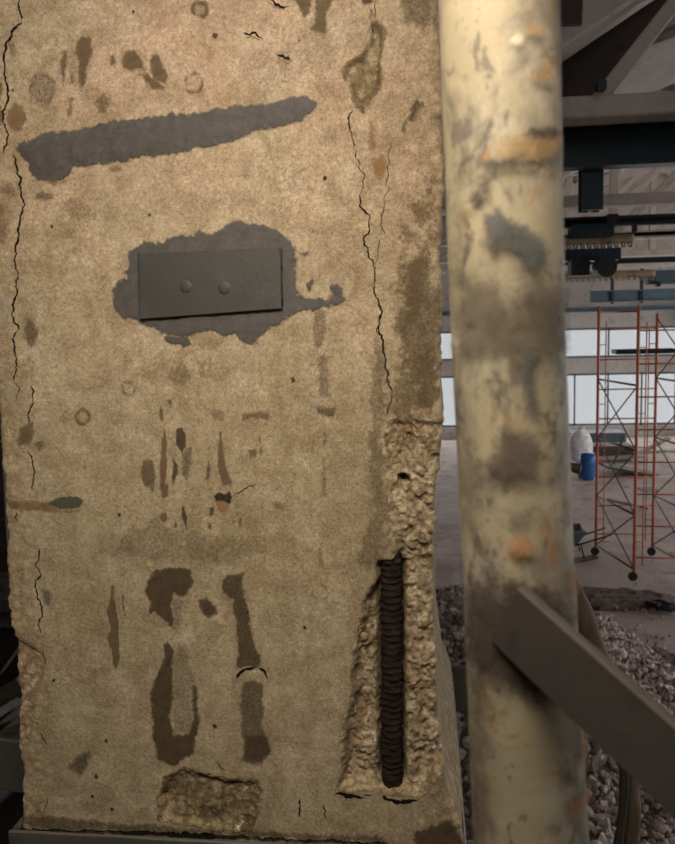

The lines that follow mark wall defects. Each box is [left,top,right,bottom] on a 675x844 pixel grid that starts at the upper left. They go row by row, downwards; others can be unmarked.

leakage [297,0,331,33]
leakage [111,50,167,89]
crack [1,0,34,421]
crack [347,112,393,414]
leakage [141,427,191,497]
crack [34,550,46,665]
leakage [145,567,193,626]
leakage [222,573,260,668]
spalling [337,413,445,798]
leakage [150,643,200,765]
crack [236,667,268,679]
spalling [156,768,263,832]